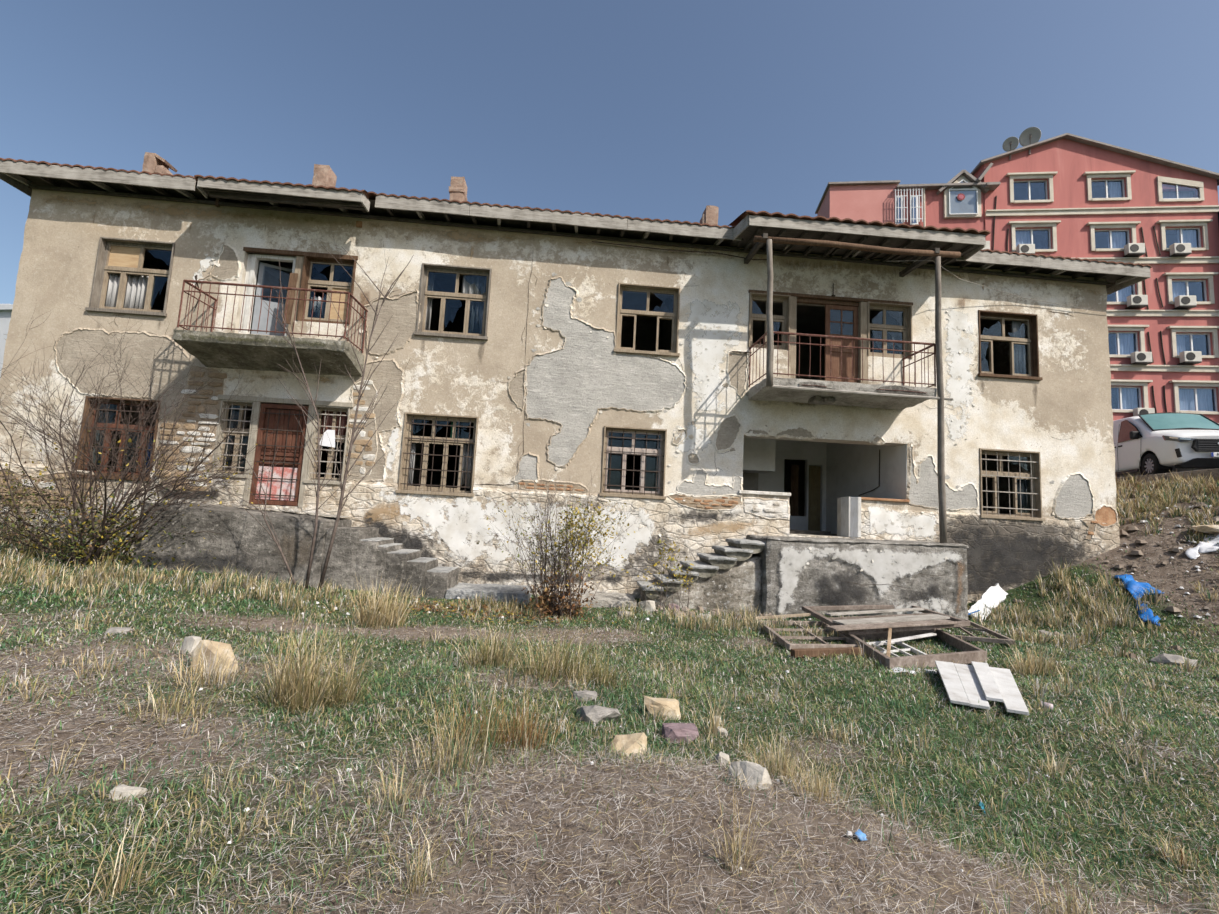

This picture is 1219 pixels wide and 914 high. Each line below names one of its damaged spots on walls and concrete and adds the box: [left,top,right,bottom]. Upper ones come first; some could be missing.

spalling [53,327,227,494]
spalling [345,272,817,571]
spalling [799,381,835,405]
spalling [869,434,886,445]
spalling [874,385,928,395]
peeling [945,307,976,445]
damp [817,571,867,606]
peeling [778,443,979,613]
damp [954,528,1085,593]
spalling [1050,472,1119,541]